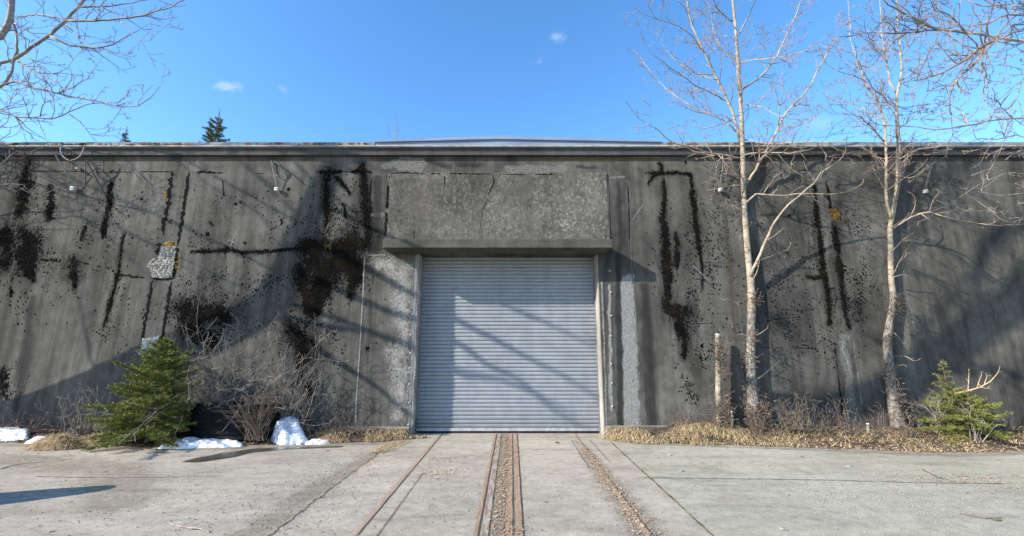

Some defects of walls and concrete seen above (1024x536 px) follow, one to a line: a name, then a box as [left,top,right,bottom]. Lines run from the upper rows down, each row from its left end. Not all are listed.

crack [307,171,551,248]
spalling [146,246,176,278]
water stain [601,183,656,425]